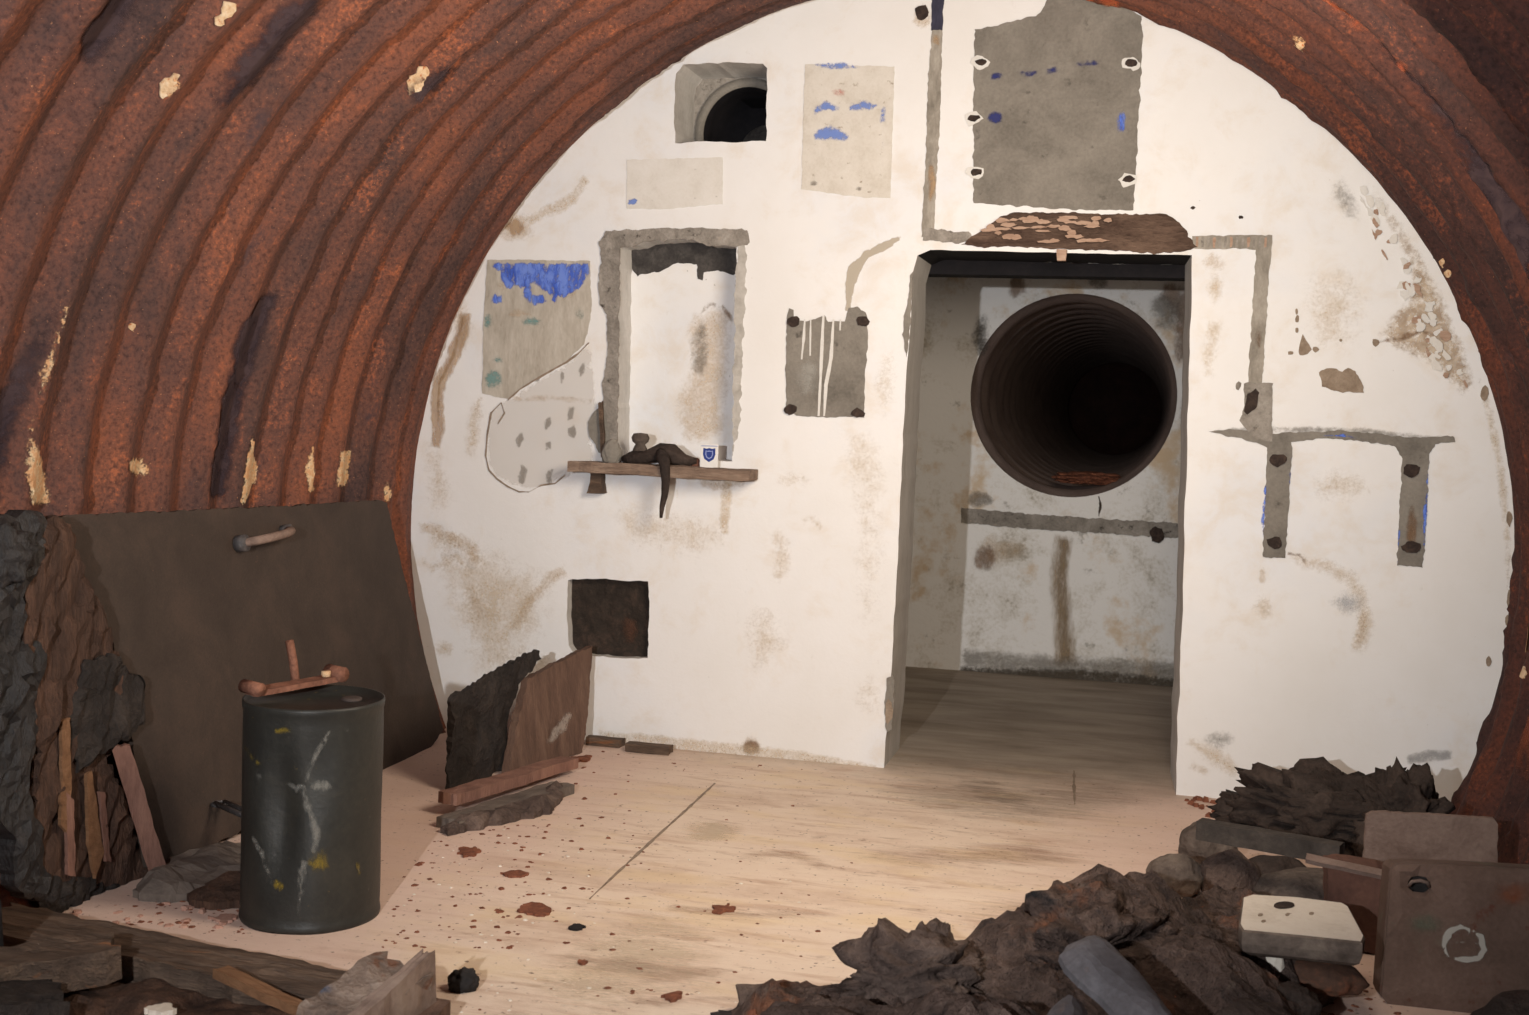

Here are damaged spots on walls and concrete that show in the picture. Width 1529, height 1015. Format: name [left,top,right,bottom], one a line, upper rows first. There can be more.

rust [82,0,135,63]
rust [219,0,318,106]
rust [410,69,451,102]
peeling [626,157,723,209]
peeling [965,0,1143,243]
rust [1381,42,1529,279]
rust [0,344,42,465]
rust [211,294,278,498]
peeling [482,227,750,456]
peeling [784,307,870,418]
water stain [961,540,1174,687]